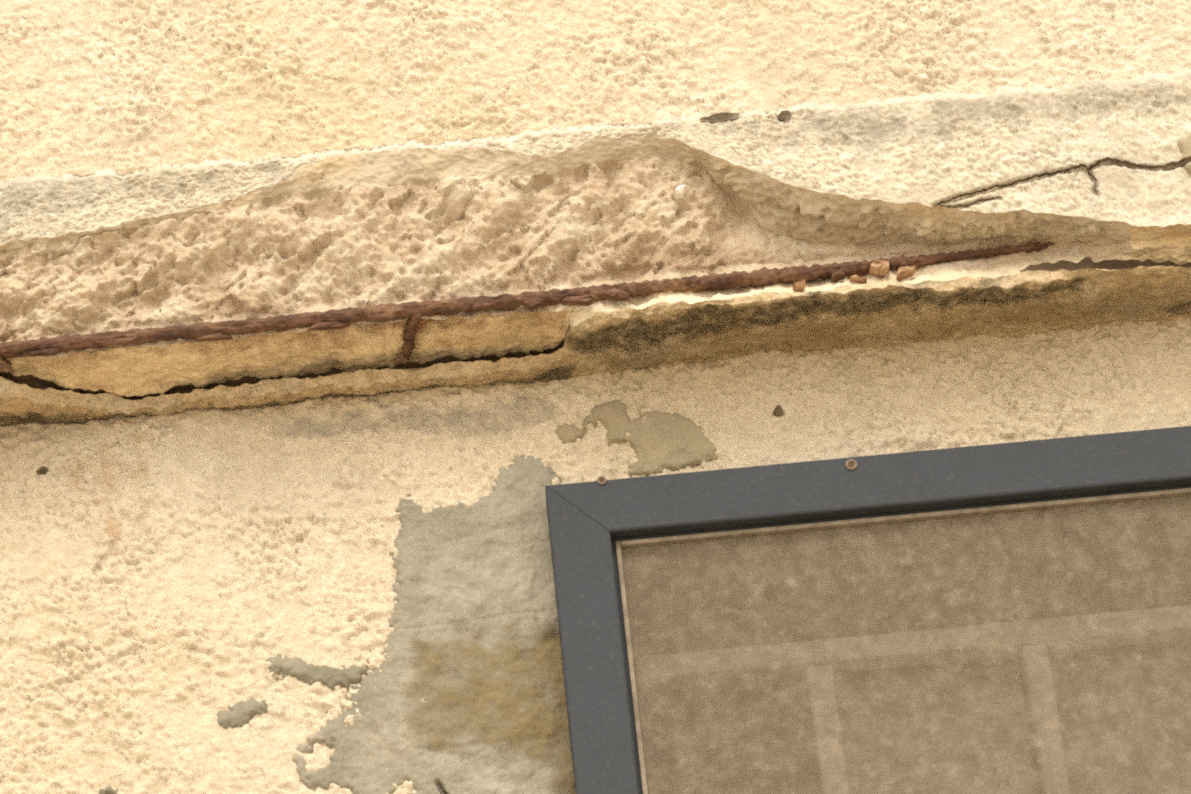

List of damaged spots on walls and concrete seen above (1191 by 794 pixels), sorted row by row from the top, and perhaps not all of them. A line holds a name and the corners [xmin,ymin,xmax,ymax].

peeling [700,112,740,123]
peeling [777,110,790,122]
crack [935,157,1191,208]
spalling [0,133,1191,397]
crack [0,325,571,400]